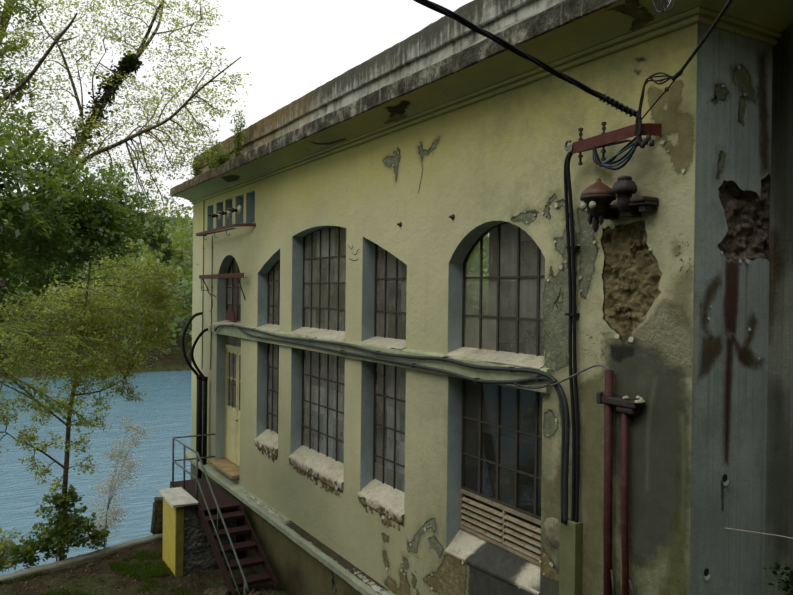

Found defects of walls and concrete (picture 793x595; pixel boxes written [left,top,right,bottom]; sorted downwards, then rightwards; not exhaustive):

water stain [461,13,539,51]
peeling [605,0,654,31]
water stain [384,100,410,124]
peeling [711,64,756,126]
peeling [383,147,401,180]
peeling [417,138,440,161]
spalling [716,150,770,264]
spalling [511,193,662,372]
water stain [584,332,689,566]
peeling [352,518,467,595]